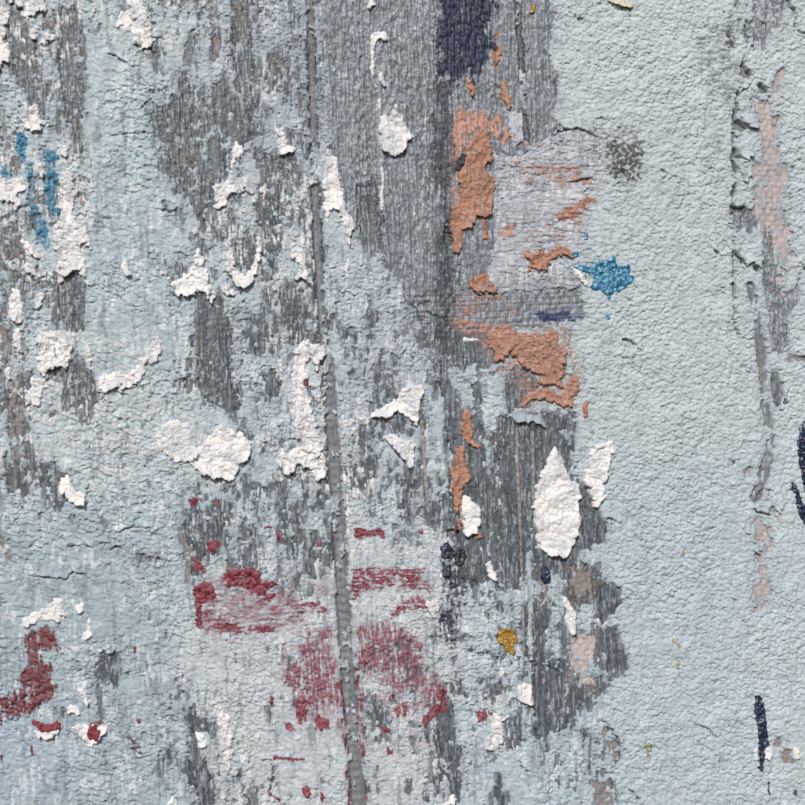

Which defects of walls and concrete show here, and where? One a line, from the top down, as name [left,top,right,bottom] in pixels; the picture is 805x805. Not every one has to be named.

peeling [0,0,102,177]
peeling [505,69,528,145]
peeling [356,178,382,259]
peeling [730,68,796,298]
peeling [0,147,87,520]
peeling [142,0,346,605]
peeling [47,354,101,426]
peeling [770,372,783,406]
peeling [329,300,629,805]
peeling [749,517,772,612]
peeling [157,698,278,805]